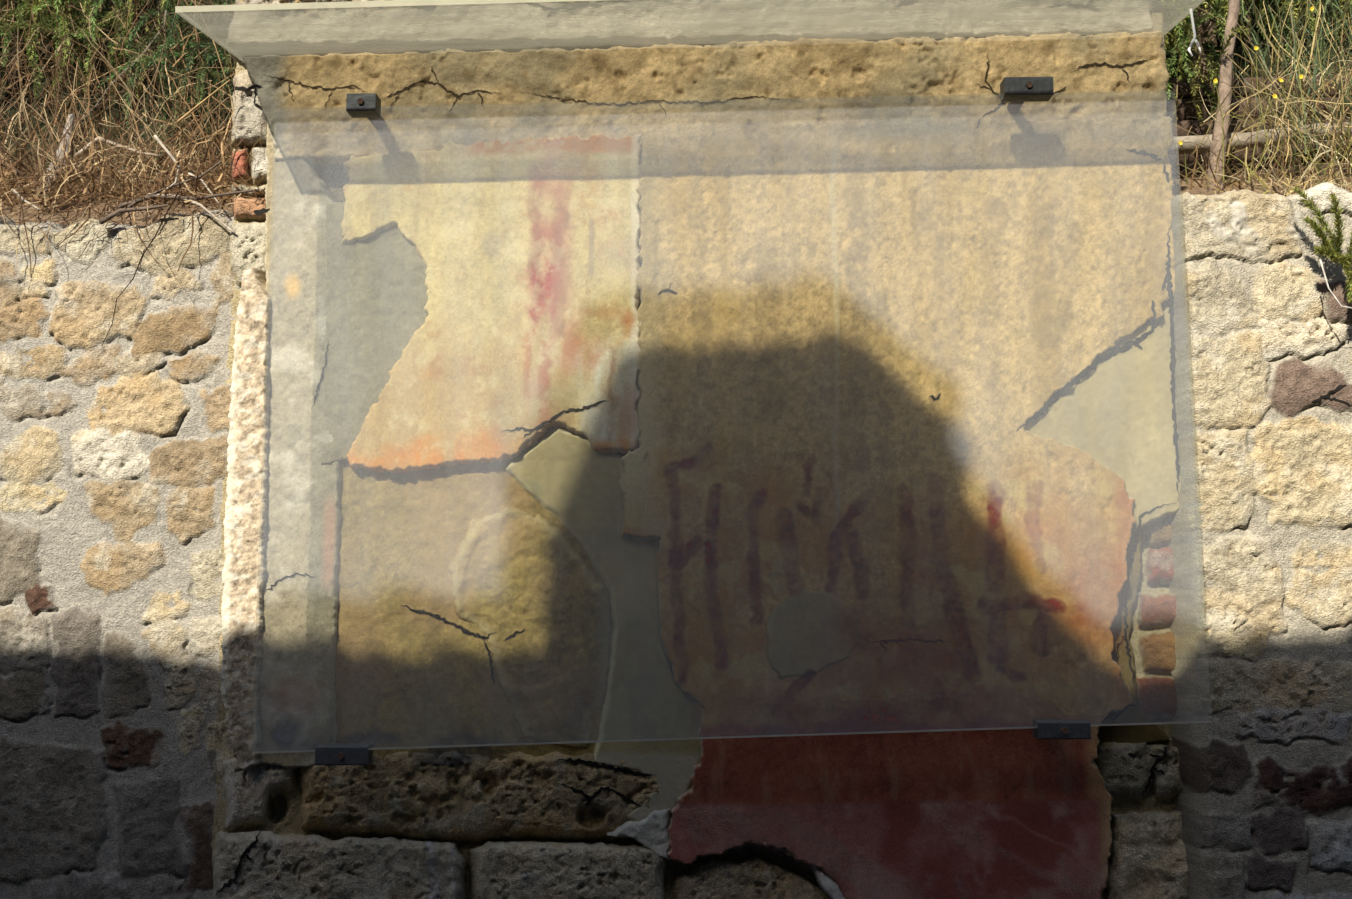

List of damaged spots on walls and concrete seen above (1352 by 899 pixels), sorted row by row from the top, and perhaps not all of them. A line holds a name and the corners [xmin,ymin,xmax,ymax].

crack [231,66,805,117]
crack [973,53,1006,132]
crack [1053,59,1152,95]
crack [504,399,611,437]
flaking render [1024,302,1181,531]
flaking render [321,200,609,770]
crack [1017,228,1180,722]
crack [401,605,525,683]
flaking render [606,809,671,861]
flaking render [811,865,850,899]